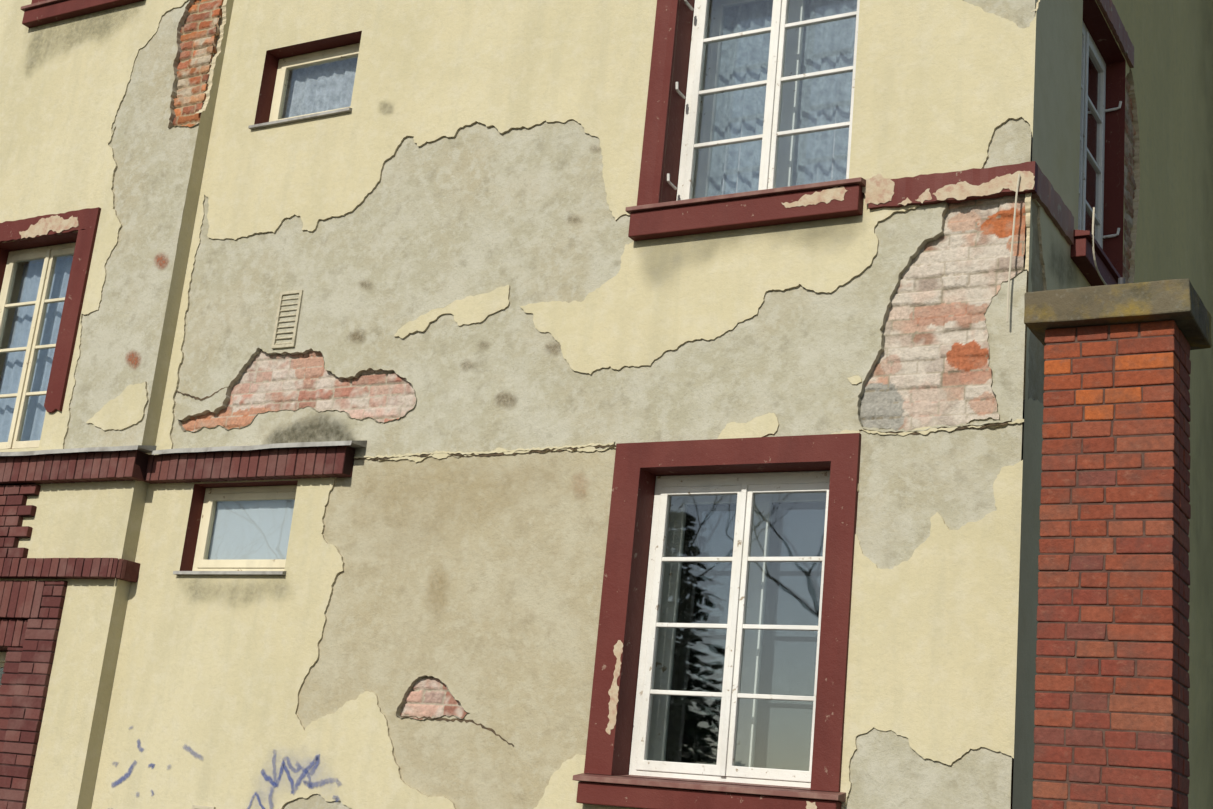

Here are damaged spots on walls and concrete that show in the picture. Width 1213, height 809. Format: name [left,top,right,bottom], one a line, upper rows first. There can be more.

flaking render [63,0,227,449]
flaking render [963,0,1040,28]
flaking render [1118,68,1140,284]
flaking render [170,117,1047,809]